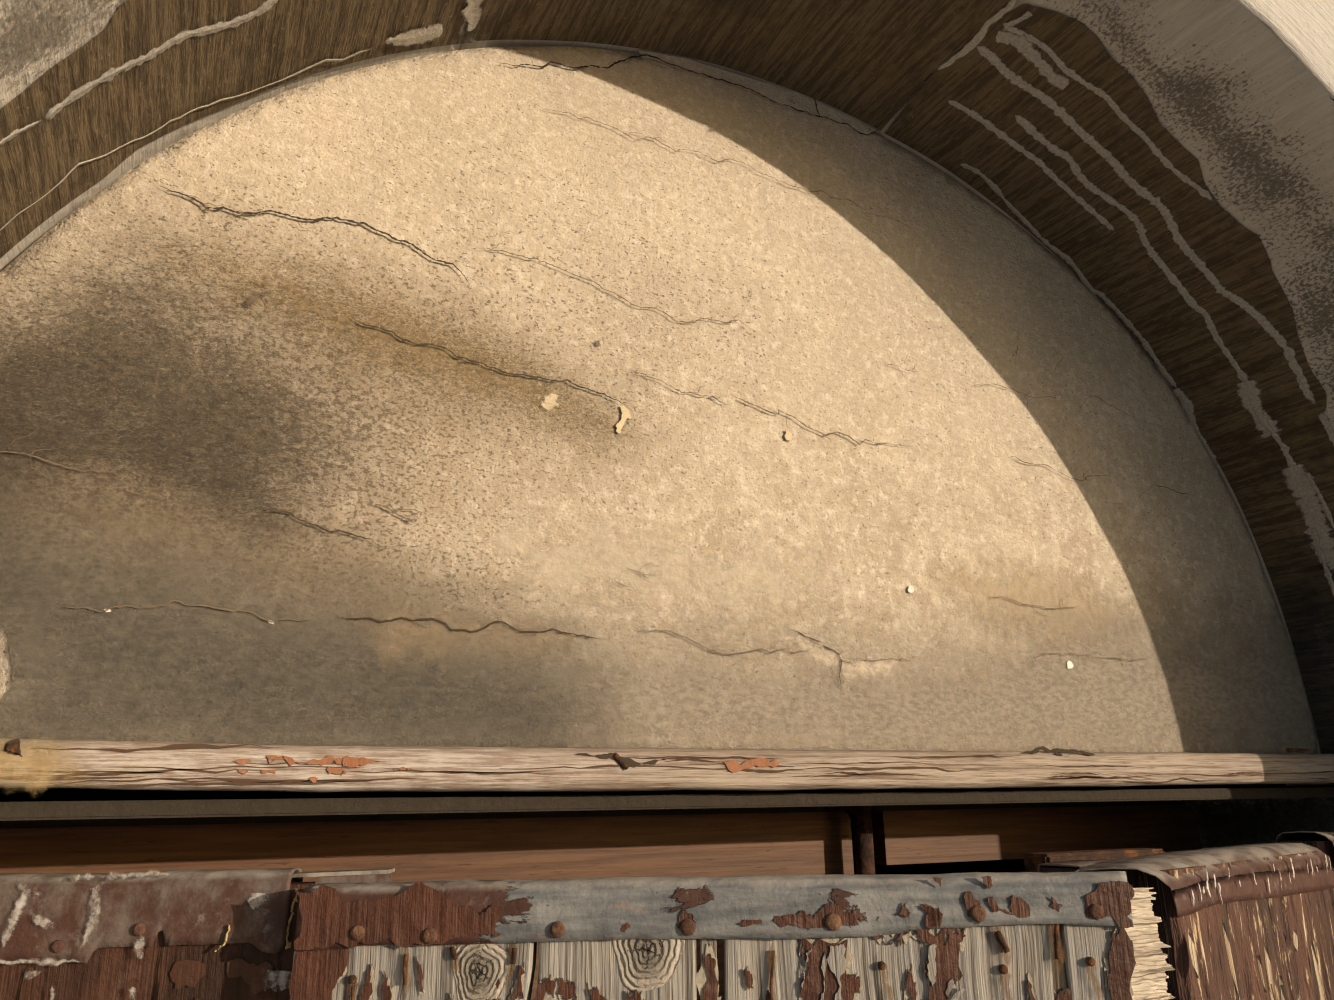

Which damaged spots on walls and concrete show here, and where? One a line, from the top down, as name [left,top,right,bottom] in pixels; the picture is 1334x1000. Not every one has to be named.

crack [161,186,760,335]
crack [350,313,912,447]
water stain [0,0,1334,753]
crack [64,600,601,653]
crack [639,629,911,692]
peeling [227,881,501,1000]
peeling [486,966,605,1000]
peeling [701,954,719,1000]
peeling [738,903,867,1000]
peeling [872,876,1030,1000]
peeling [1054,988,1072,1000]
peeling [1084,881,1136,1000]